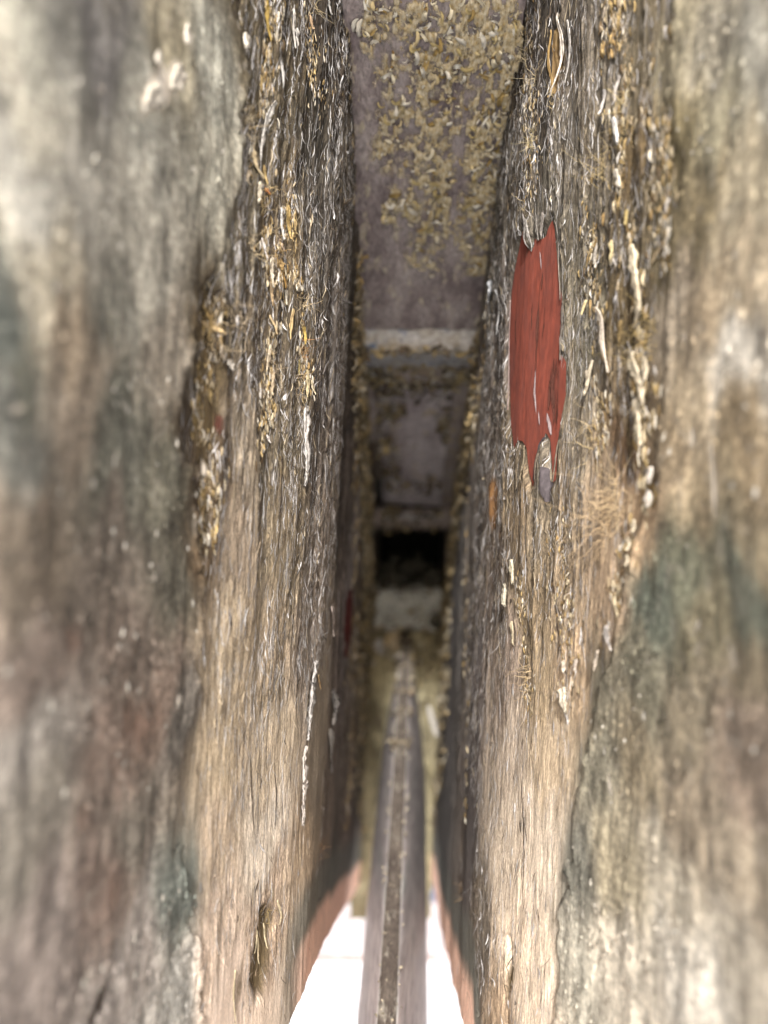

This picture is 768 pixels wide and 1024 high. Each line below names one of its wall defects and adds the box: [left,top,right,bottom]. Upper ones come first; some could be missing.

peeling [188,280,235,565]
peeling [243,0,333,474]
peeling [329,424,370,850]
peeling [346,0,678,725]
crack [552,570,567,681]